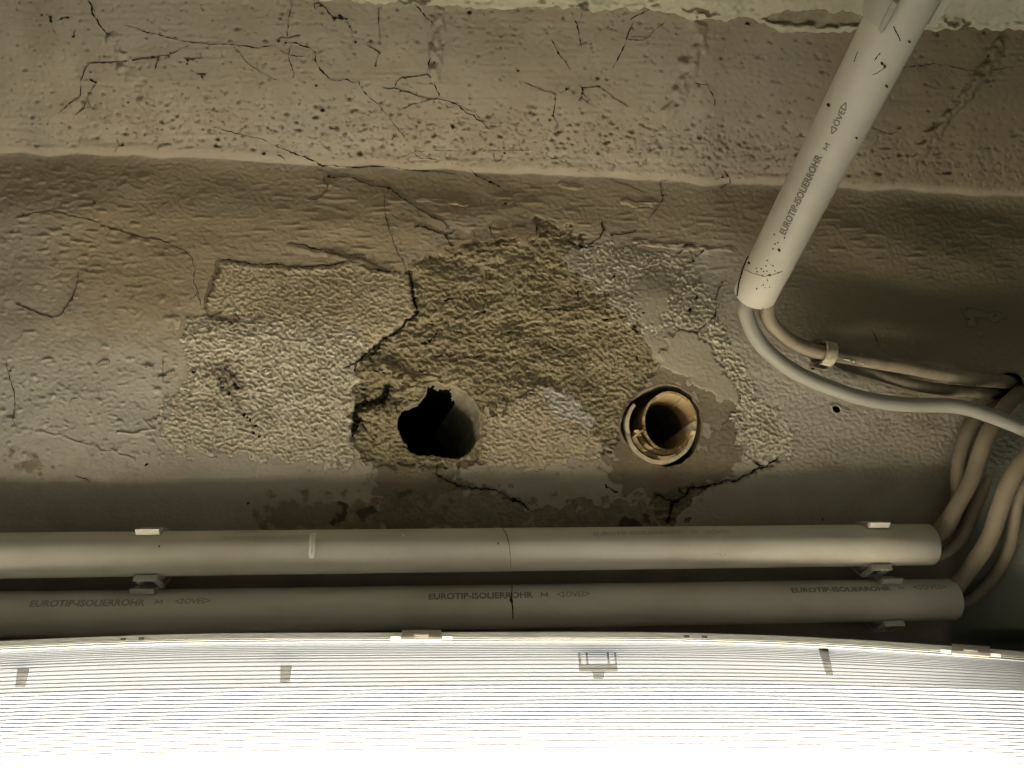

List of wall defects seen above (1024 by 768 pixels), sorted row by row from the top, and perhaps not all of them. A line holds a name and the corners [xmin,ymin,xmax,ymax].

crack [613,10,664,67]
crack [88,1,645,193]
crack [568,241,665,260]
peeling [204,261,240,323]
flaking render [346,217,659,470]
crack [436,463,529,511]
spalling [650,481,708,526]
crack [655,459,777,524]